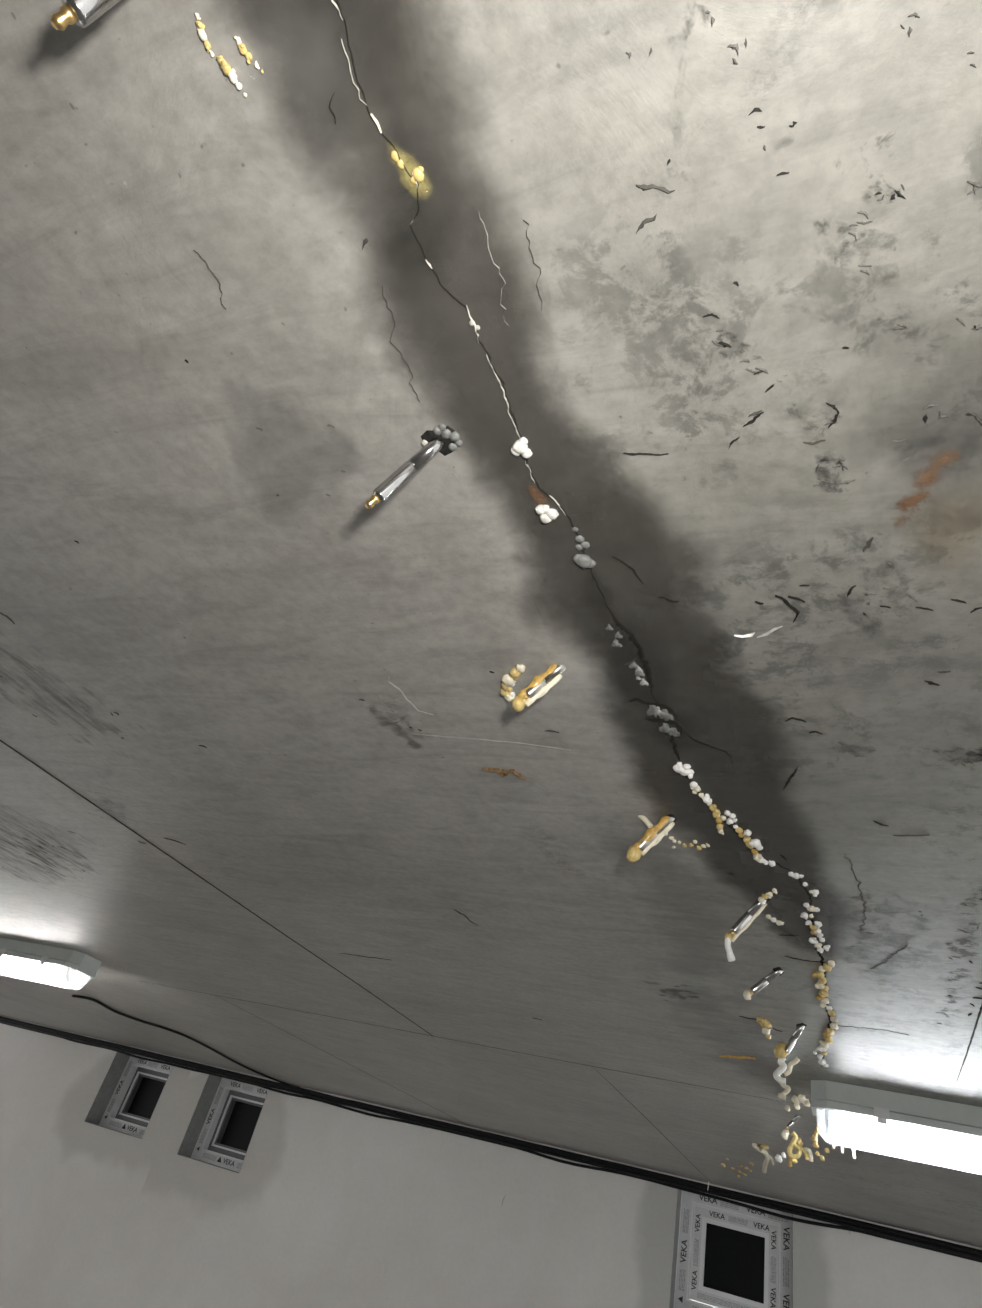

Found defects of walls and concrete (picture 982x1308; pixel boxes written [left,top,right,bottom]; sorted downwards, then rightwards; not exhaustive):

water stain [195,13,264,98]
crack [329,0,733,793]
water stain [249,0,844,1111]
corrosion [896,452,957,524]
crack [724,821,908,1068]